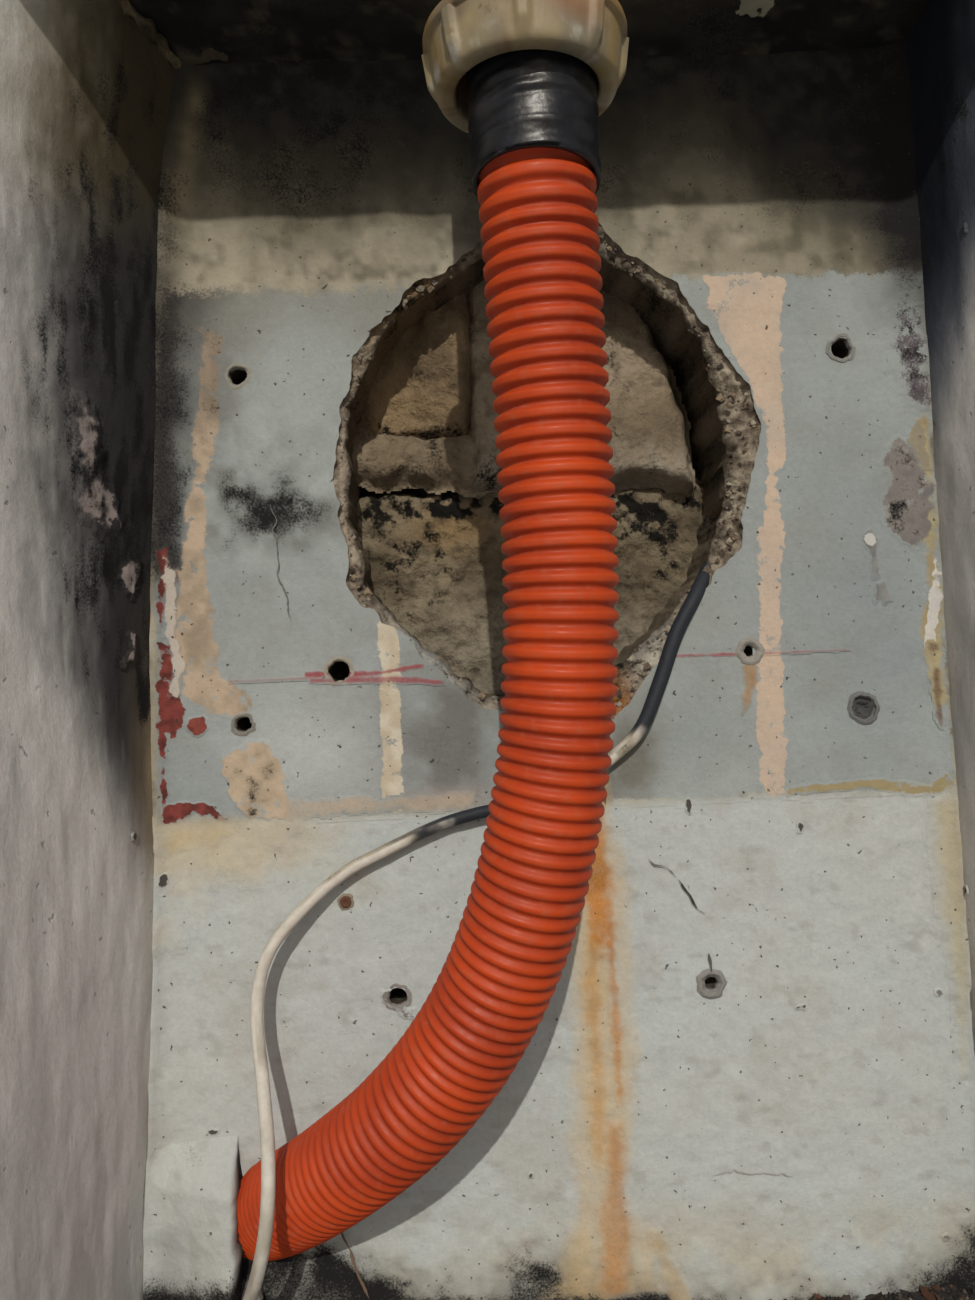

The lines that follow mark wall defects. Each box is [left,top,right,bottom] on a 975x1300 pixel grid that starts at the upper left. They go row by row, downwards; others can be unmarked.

peeling [732,0,777,20]
peeling [65,387,133,543]
spalling [116,240,508,824]
spalling [596,223,791,801]
peeling [861,279,944,654]
corrosion [532,752,697,1300]